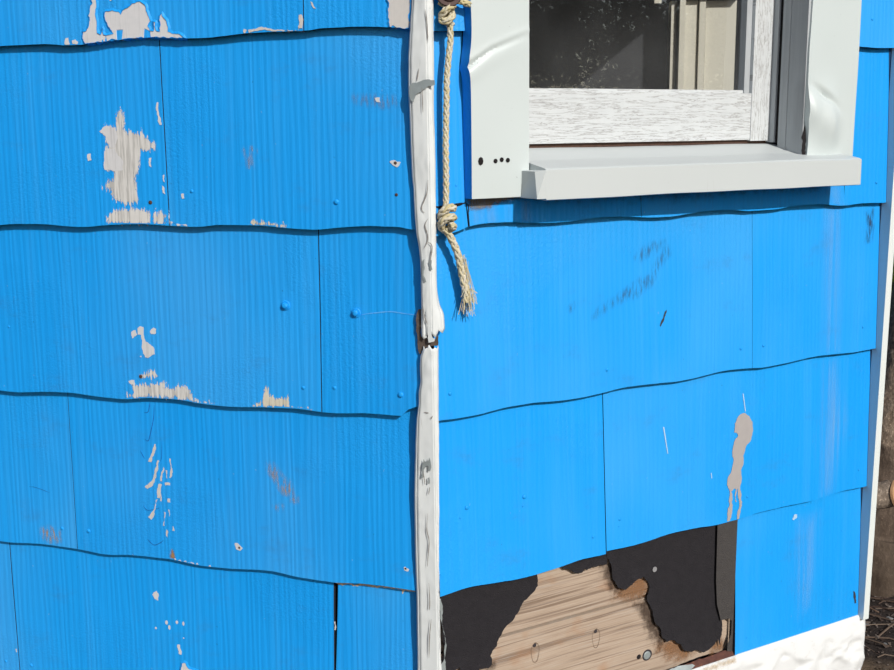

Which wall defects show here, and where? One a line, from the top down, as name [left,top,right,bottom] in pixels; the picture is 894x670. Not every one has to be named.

peeling [65,0,188,47]
peeling [243,14,305,33]
peeling [385,0,412,32]
peeling [99,106,187,226]
peeling [131,326,156,358]
peeling [126,368,212,404]
peeling [253,387,309,409]
peeling [145,444,175,536]
peeling [177,637,198,670]